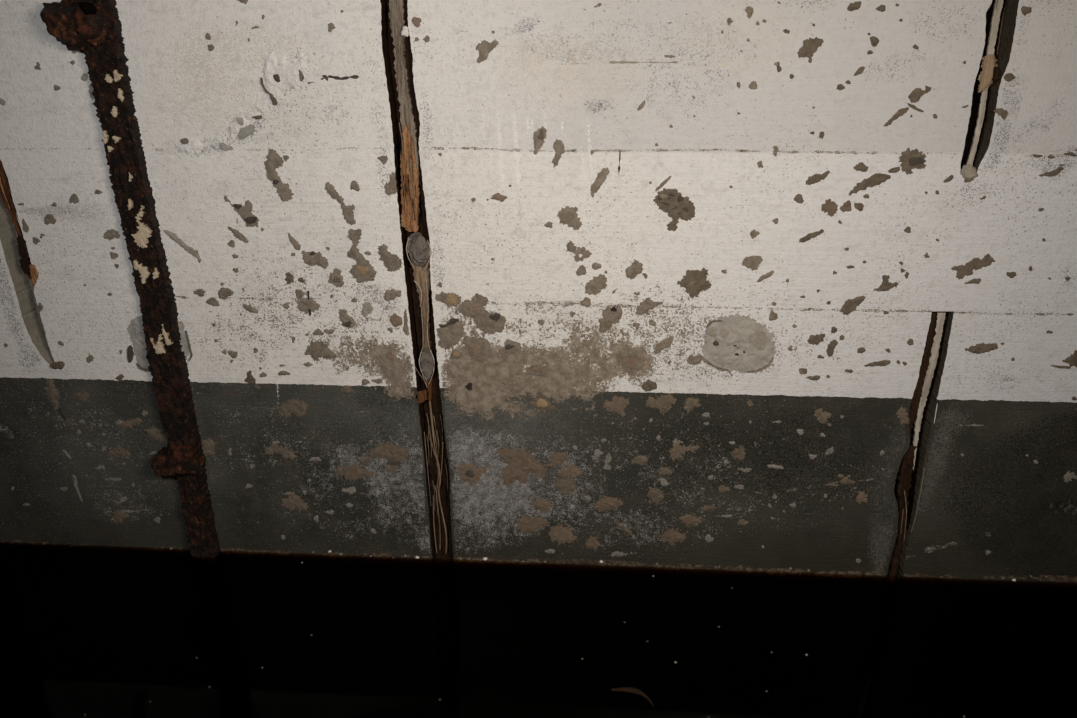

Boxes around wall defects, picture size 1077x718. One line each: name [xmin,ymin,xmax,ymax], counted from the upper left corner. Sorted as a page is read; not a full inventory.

spalling [401,17,430,42]
spalling [18,194,79,245]
peeling [435,181,910,555]
efflorescence [271,395,430,554]
damp [444,394,906,583]